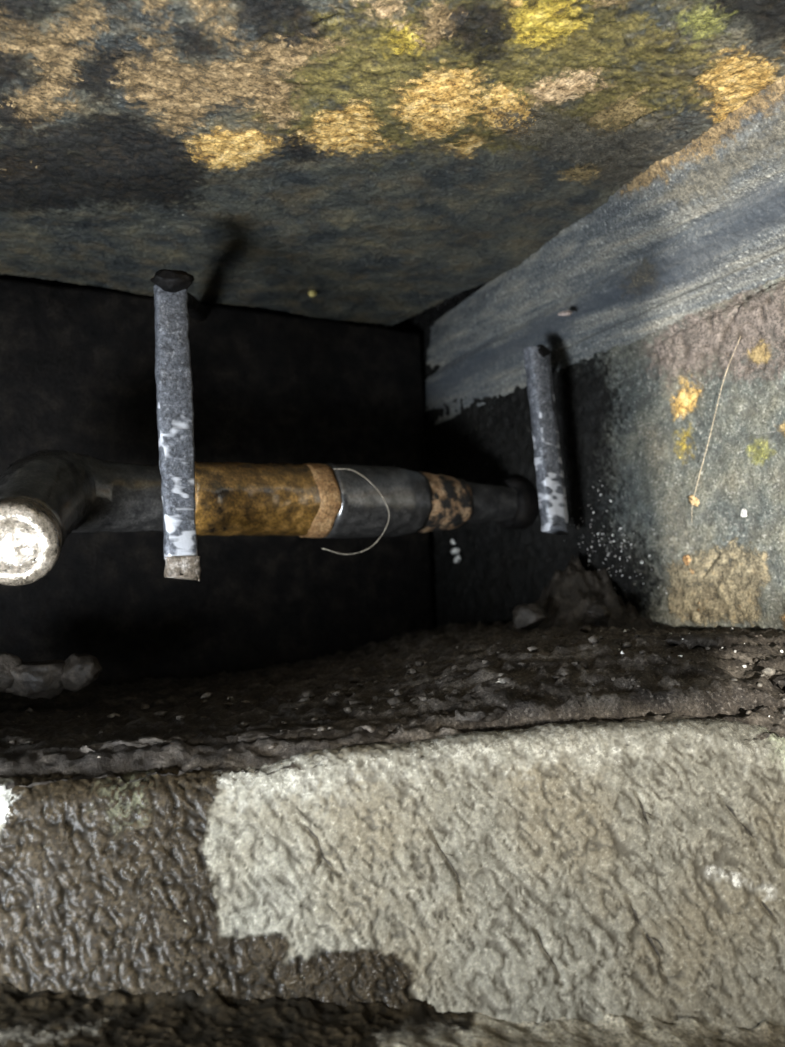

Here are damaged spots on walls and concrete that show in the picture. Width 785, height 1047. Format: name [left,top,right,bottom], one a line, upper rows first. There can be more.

leakage [493,107,674,187]
leakage [670,115,785,204]
leakage [386,724,617,772]
leakage [720,722,785,760]
leakage [0,755,474,1047]